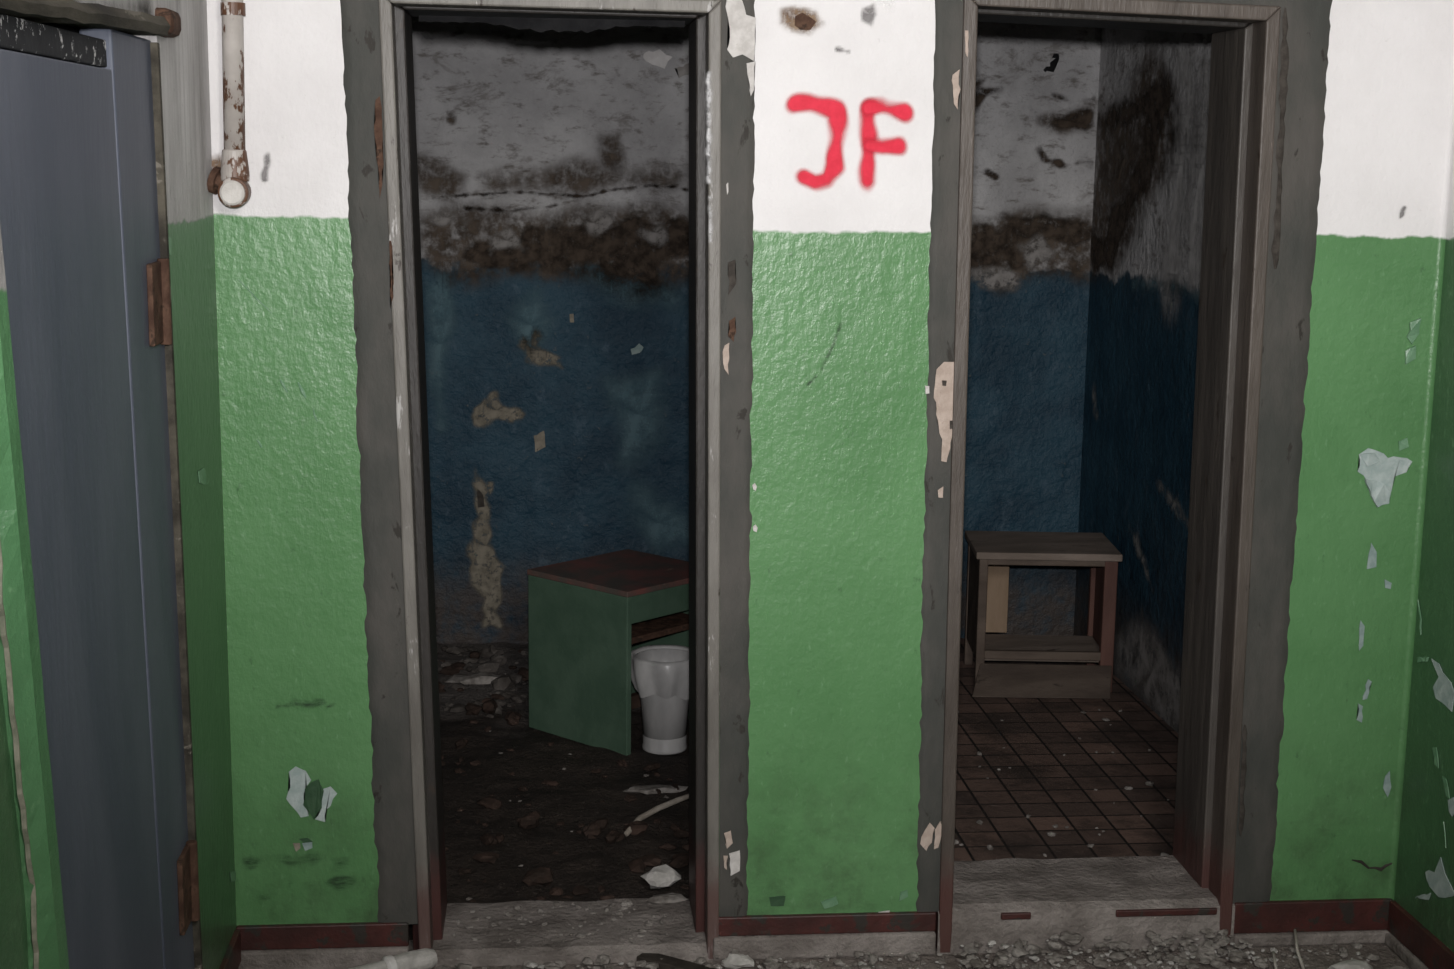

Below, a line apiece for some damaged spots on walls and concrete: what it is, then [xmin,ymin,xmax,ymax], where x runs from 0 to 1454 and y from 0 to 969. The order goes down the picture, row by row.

peeling [725,0,756,95]
corrosion [782,8,818,32]
corrosion [207,158,222,194]
water stain [417,157,462,198]
water stain [489,137,682,194]
peeling [925,362,954,462]
peeling [1357,438,1412,507]
peeling [1417,656,1454,712]
peeling [286,766,337,822]
peeling [723,831,740,876]
peeling [920,822,942,851]
peeling [1416,747,1454,900]